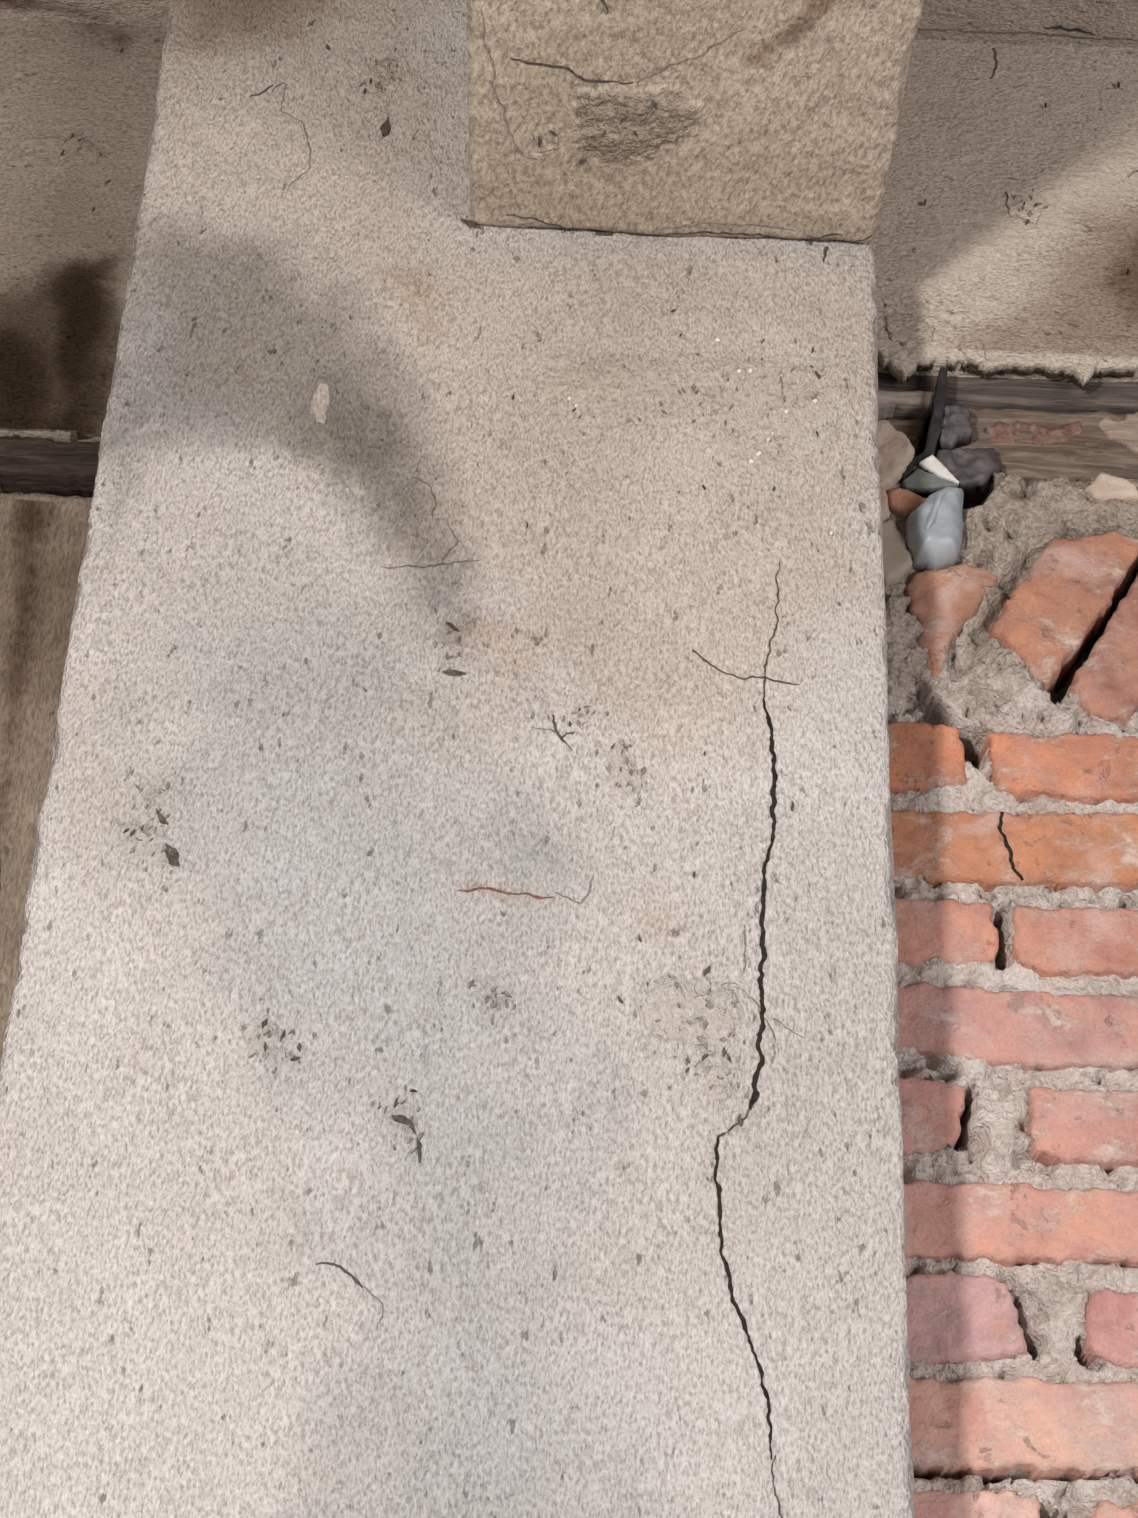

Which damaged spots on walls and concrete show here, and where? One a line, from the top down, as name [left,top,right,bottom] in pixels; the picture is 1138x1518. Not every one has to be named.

crack [692,561,804,1518]
crack [997,811,1024,881]